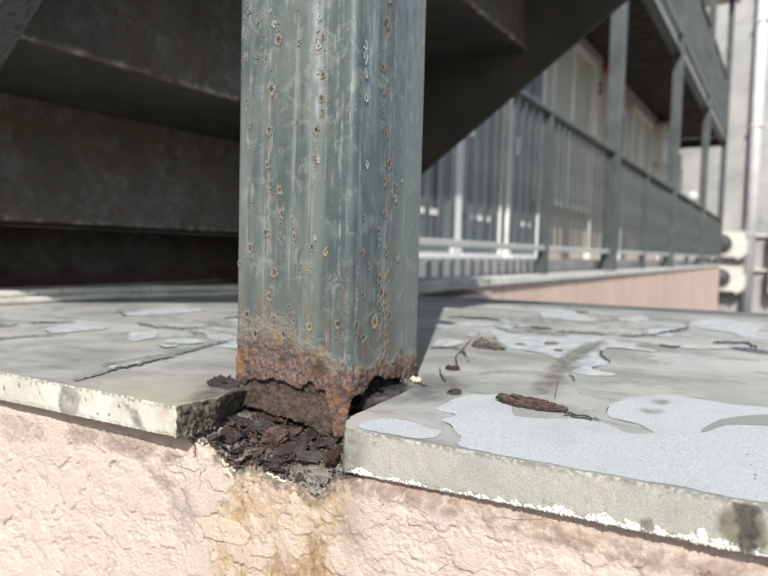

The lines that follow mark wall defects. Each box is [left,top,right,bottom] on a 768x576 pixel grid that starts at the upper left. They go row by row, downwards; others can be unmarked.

crack [162,438,205,488]
rust [235,417,290,445]
spalling [186,408,360,498]
rust [351,376,422,410]
peeling [350,394,768,503]
leakage [349,467,768,558]